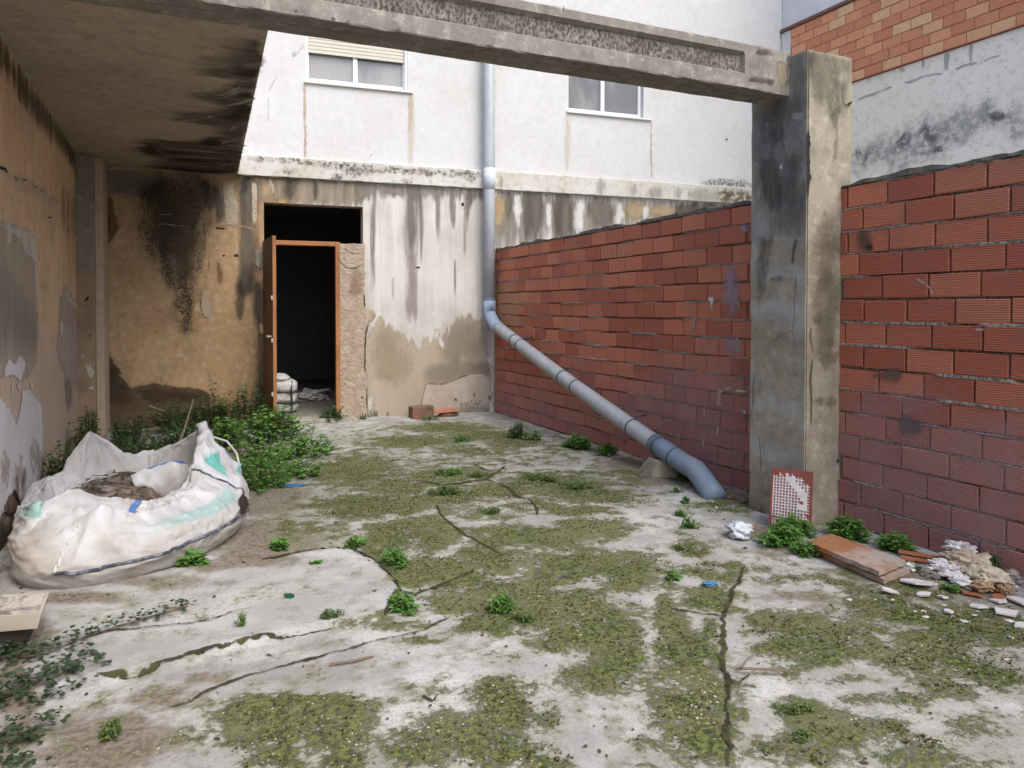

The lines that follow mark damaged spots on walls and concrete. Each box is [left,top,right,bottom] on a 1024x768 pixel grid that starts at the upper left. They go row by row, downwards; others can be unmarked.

leakage [858,102,1010,166]
peeling [0,219,39,381]
leakage [138,42,482,407]
peeling [422,374,491,414]
crack [36,607,251,647]
crack [96,448,580,714]
crack [672,566,753,768]